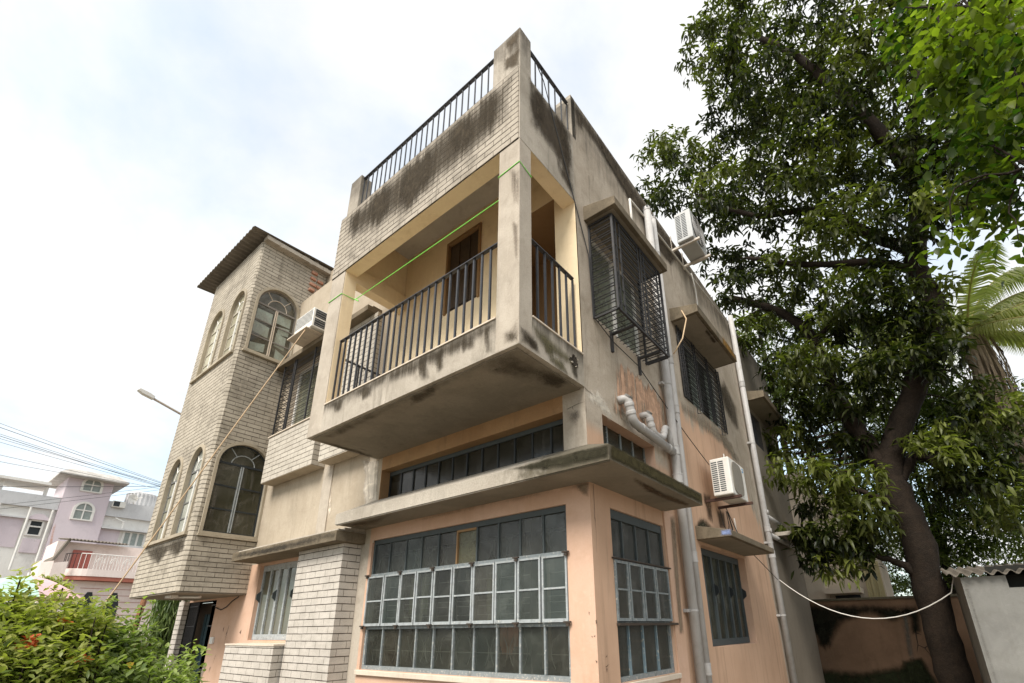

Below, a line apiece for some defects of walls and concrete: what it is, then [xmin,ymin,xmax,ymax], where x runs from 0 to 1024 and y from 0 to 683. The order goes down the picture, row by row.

water stain [349,89,503,230]
water stain [531,82,683,263]
water stain [358,330,489,398]
water stain [495,327,571,386]
water stain [519,446,725,527]